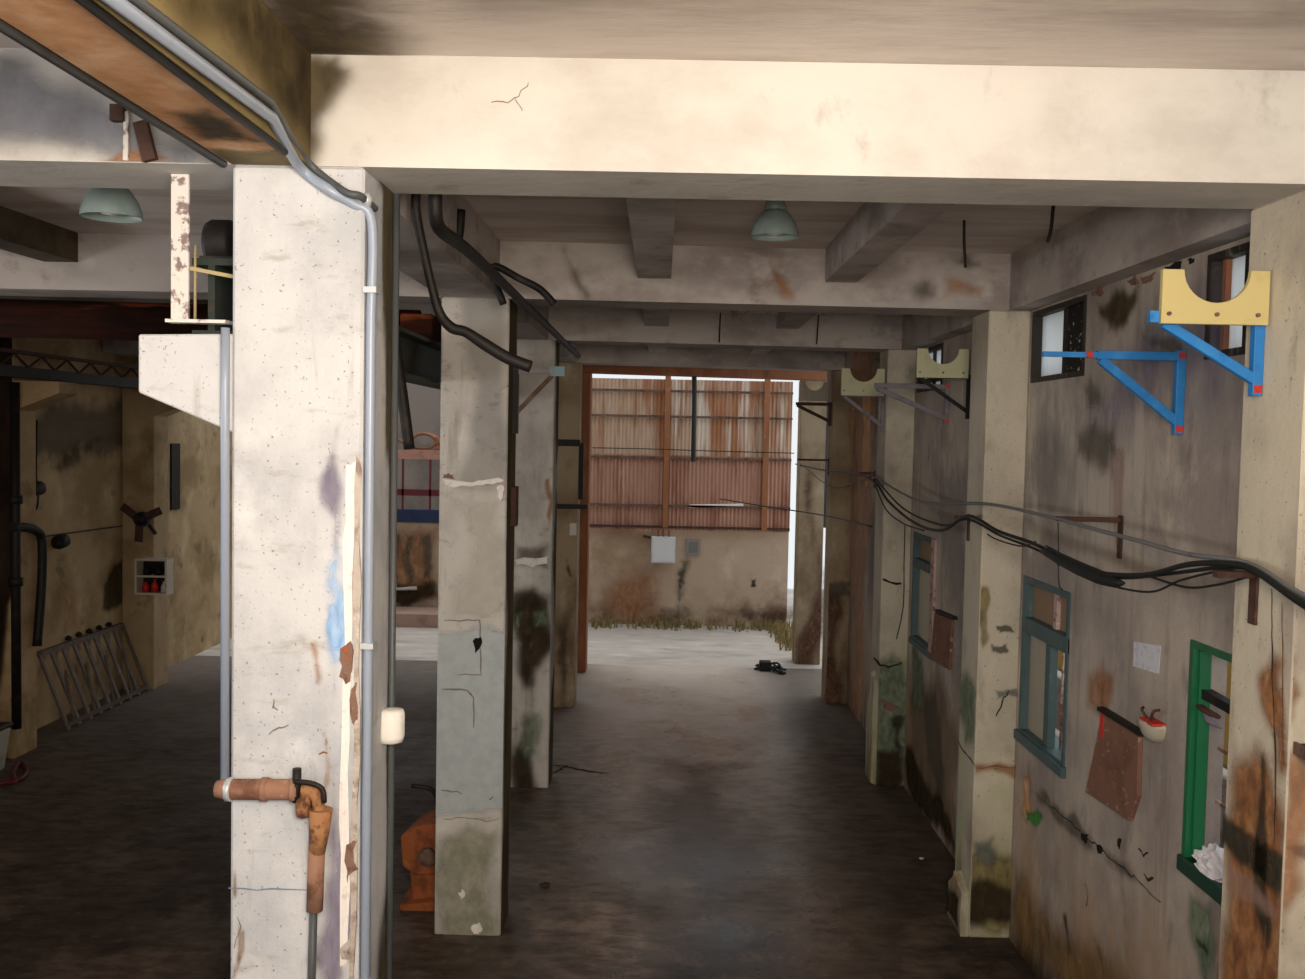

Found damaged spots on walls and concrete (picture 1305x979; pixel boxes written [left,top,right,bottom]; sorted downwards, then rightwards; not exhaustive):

crack [491,84,528,111]
water stain [513,590,551,687]
peeling [339,455,362,979]
water stain [511,718,538,788]
water stain [876,649,953,843]
water stain [959,678,974,739]
rust [1221,589,1305,979]
water stain [970,843,1120,979]
water stain [1190,900,1214,979]